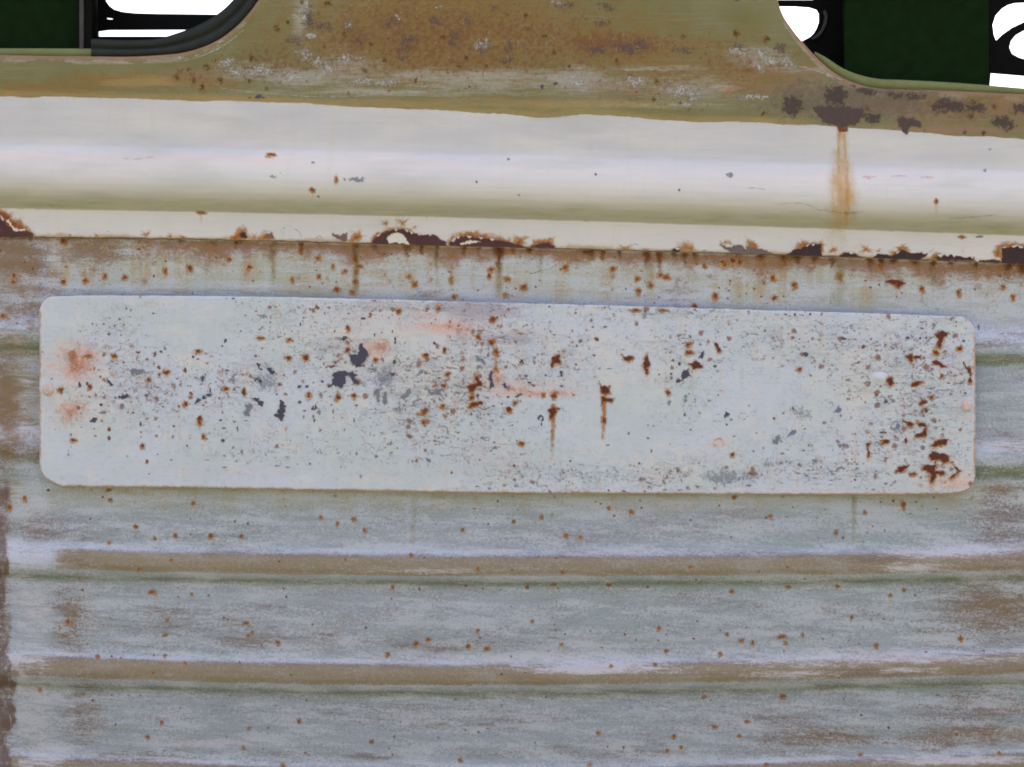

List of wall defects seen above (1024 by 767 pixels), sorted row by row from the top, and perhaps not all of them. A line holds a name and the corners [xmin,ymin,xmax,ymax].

peeling [781,85,1024,134]
peeling [0,210,35,237]
peeling [332,227,555,248]
corrosion [461,232,553,298]
corrosion [582,241,798,313]
peeling [786,242,824,256]
corrosion [780,241,844,282]
corrosion [862,245,976,298]
peeling [874,242,1024,264]
peeling [274,343,370,422]
corrosion [599,381,613,439]
corrosion [854,319,973,514]